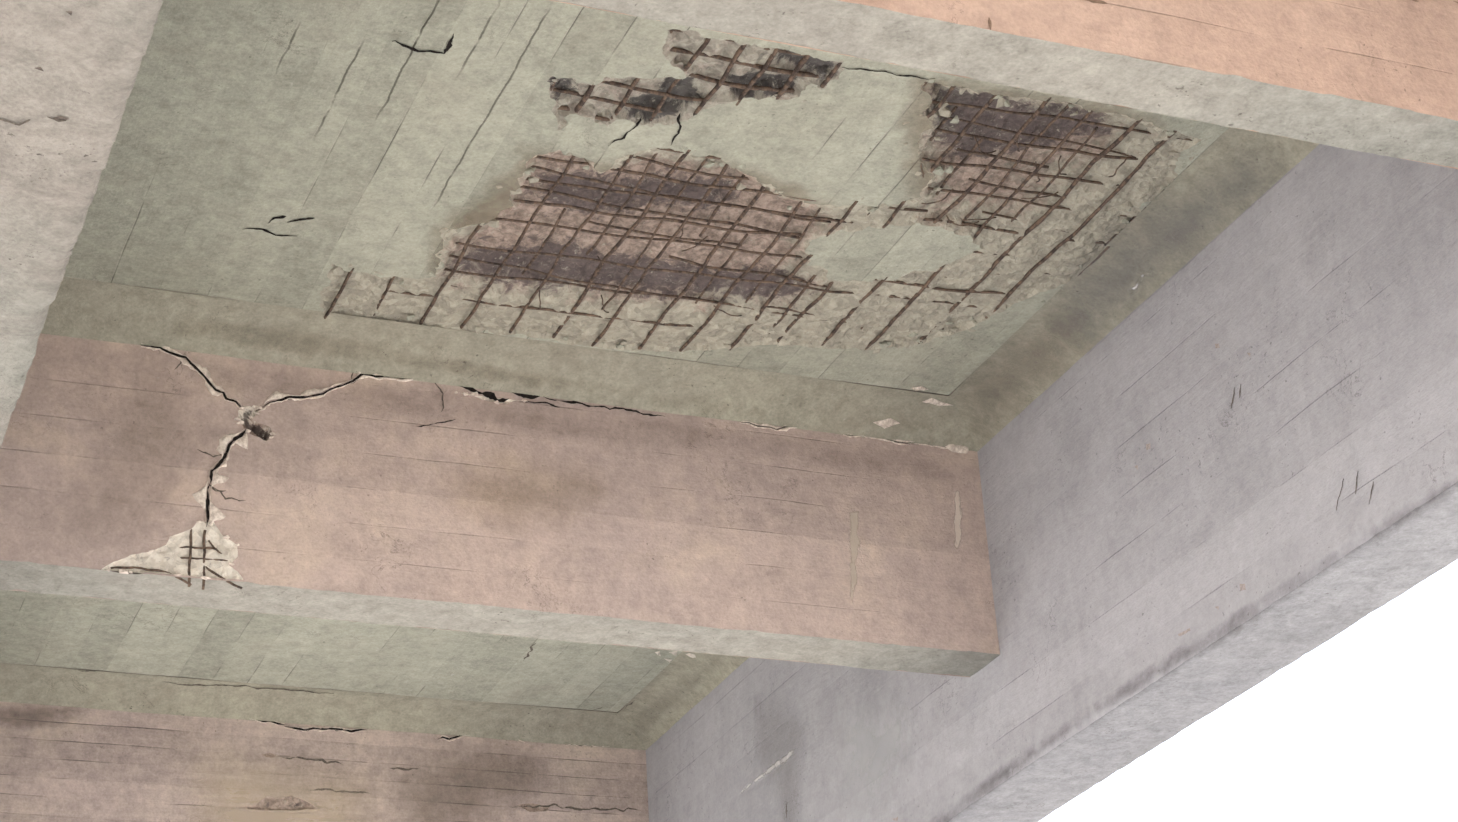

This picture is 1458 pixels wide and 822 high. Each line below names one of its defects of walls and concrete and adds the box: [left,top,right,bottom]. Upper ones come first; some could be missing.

spalling [541,29,844,131]
spalling [319,78,1201,359]
crack [141,343,663,527]
spalling [101,520,243,590]
crack [169,682,469,793]
crack [515,803,637,812]